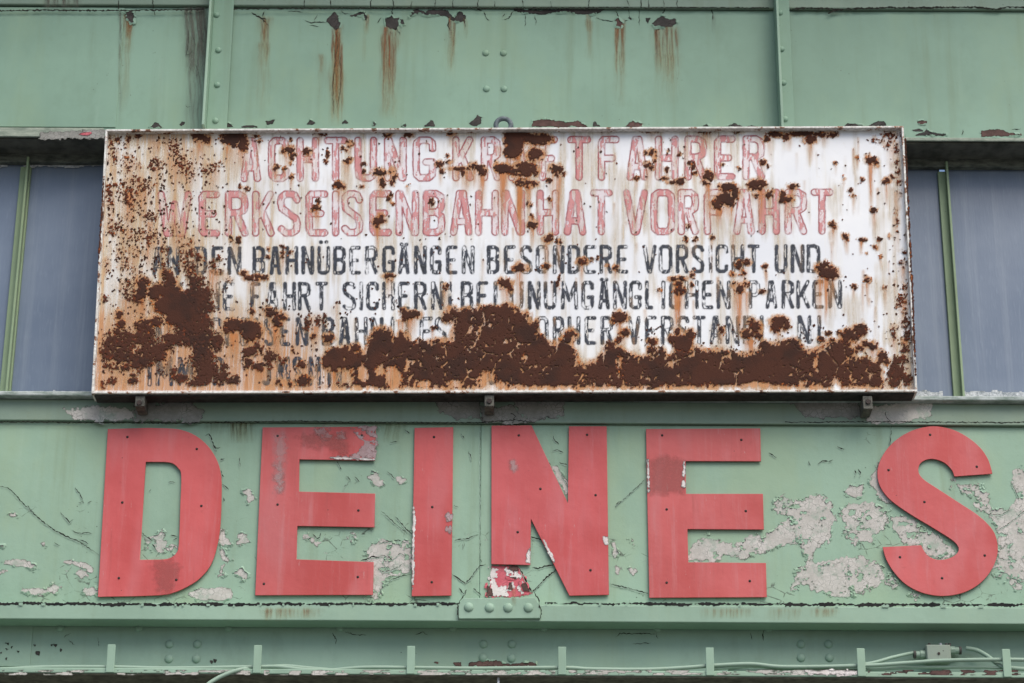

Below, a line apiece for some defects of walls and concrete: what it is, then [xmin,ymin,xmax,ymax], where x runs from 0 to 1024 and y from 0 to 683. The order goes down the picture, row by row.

rust [332,29,342,100]
rust [96,131,914,391]
peeling [62,403,205,425]
peeling [21,581,62,597]
peeling [63,559,98,597]
crack [0,413,568,619]
peeling [346,506,416,602]
peeling [484,548,533,598]
peeling [688,461,956,601]
peeling [949,464,1024,592]